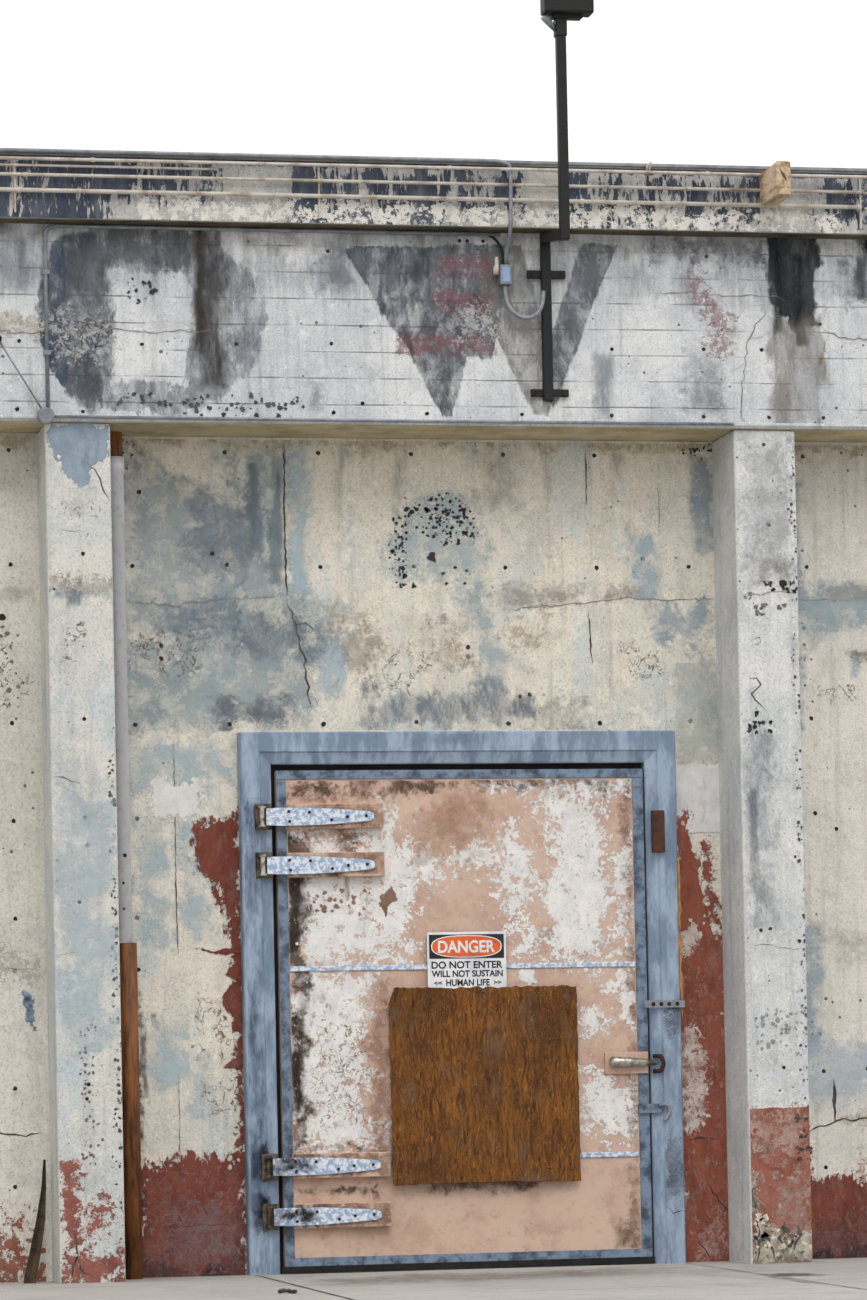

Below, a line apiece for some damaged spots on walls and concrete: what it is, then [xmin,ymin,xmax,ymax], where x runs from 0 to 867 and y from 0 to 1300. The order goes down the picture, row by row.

peeling [135,194,845,233]
water stain [738,238,823,423]
water stain [839,240,867,299]
crack [135,448,323,708]
peeling [385,492,479,588]
spalling [741,448,803,863]
peeling [0,869,125,1283]
peeling [141,773,247,1278]
peeling [288,779,639,1157]
peeling [676,763,729,1262]
peeling [750,1066,867,1264]
crack [811,1084,867,1131]